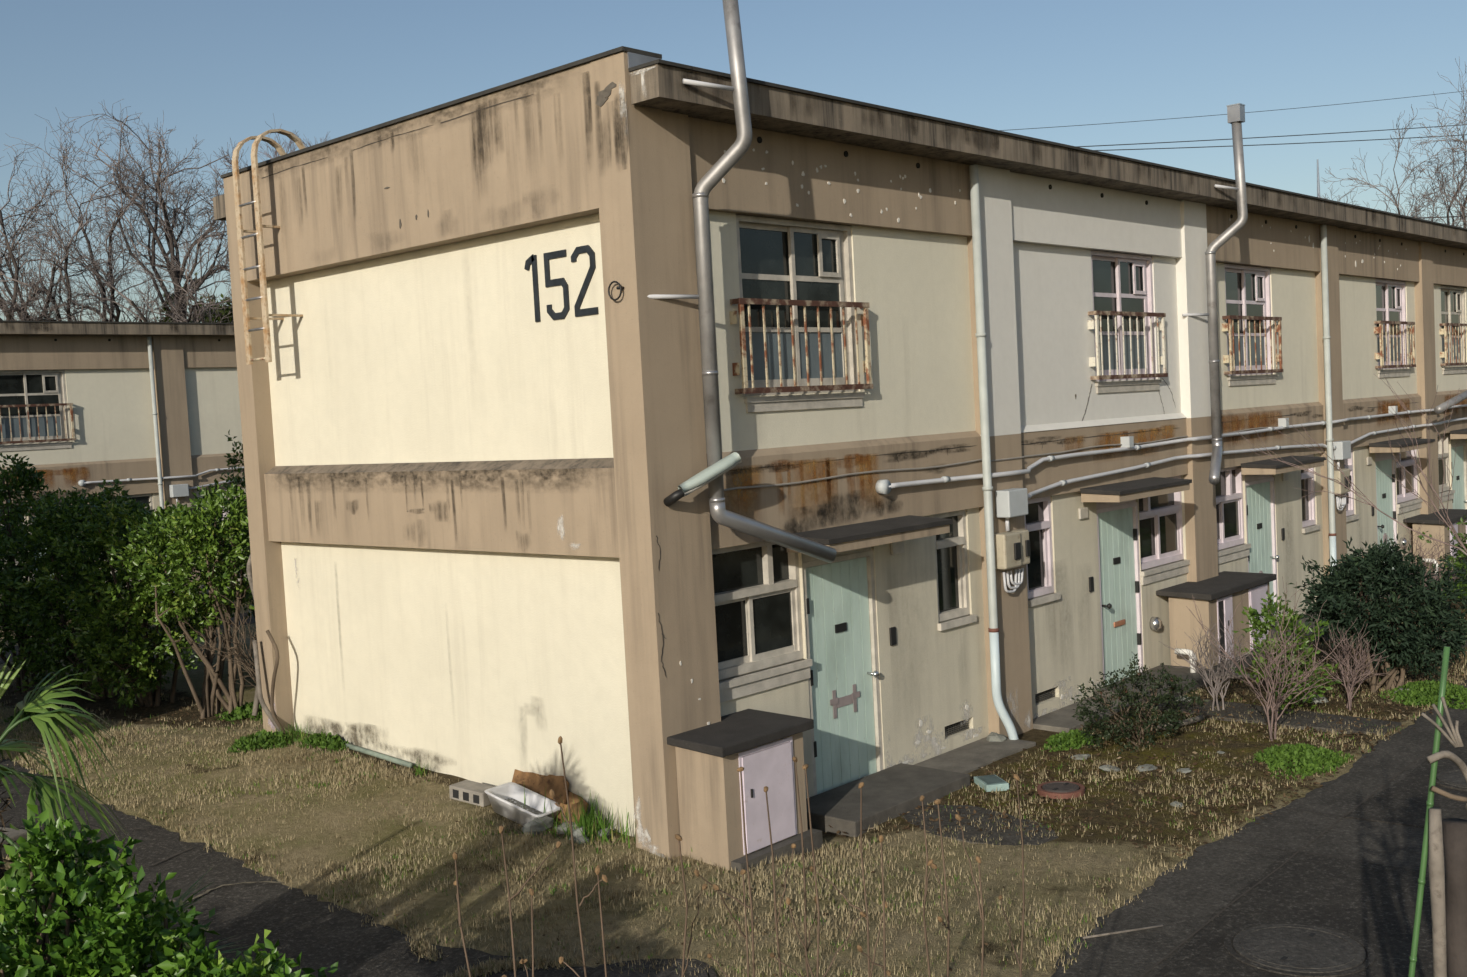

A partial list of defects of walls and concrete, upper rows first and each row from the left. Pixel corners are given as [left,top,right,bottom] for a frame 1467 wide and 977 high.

water stain [619,88,627,117]
water stain [286,471,432,495]
water stain [439,470,505,516]
corrosion [779,454,876,499]
water stain [309,723,374,746]